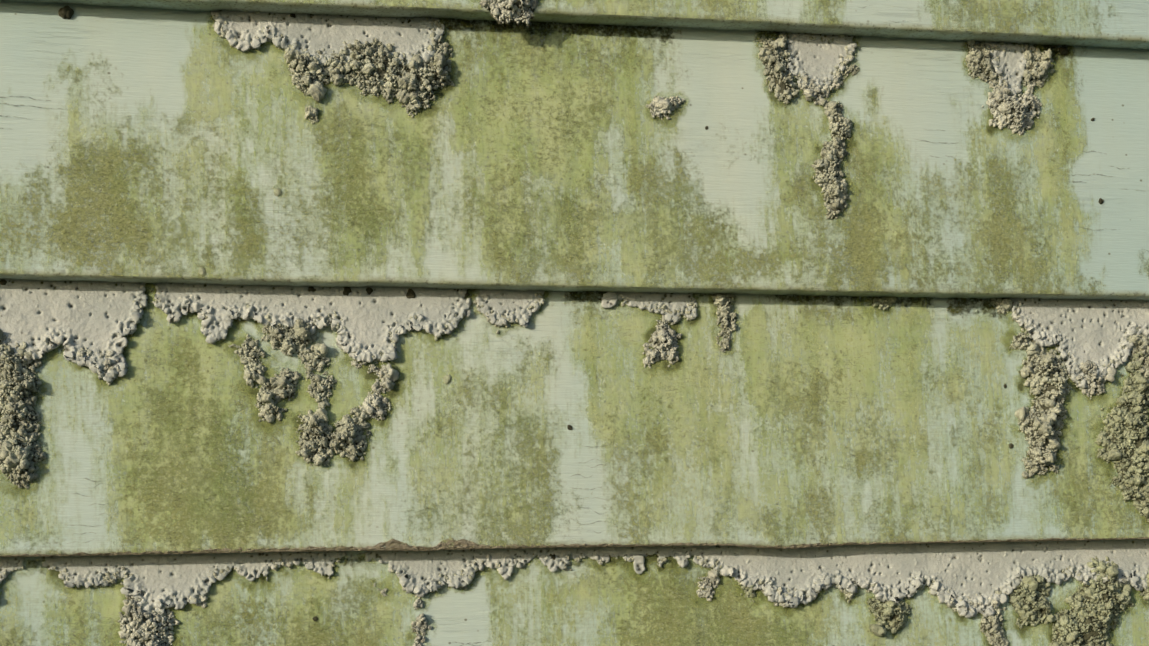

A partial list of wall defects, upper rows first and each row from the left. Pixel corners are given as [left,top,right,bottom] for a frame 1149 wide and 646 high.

damp [0,104,438,276]
peeling [209,10,455,130]
spalling [479,0,544,26]
damp [444,18,932,327]
peeling [756,32,859,221]
damp [905,156,1061,319]
peeling [963,39,1055,140]
damp [949,0,1073,158]
damp [122,337,293,551]
damp [457,378,559,546]
peeling [0,279,1149,646]
damp [616,556,822,646]